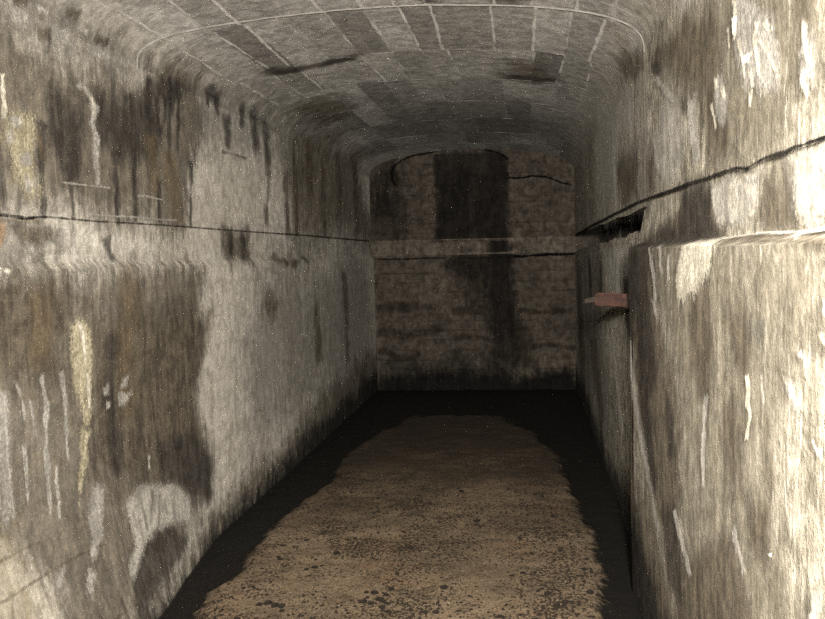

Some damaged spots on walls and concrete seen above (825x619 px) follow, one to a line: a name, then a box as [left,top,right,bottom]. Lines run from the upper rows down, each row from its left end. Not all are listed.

leakage [0,34,230,234]
leakage [239,105,271,222]
leakage [283,133,405,245]
crack [0,136,825,260]
leakage [0,151,825,619]